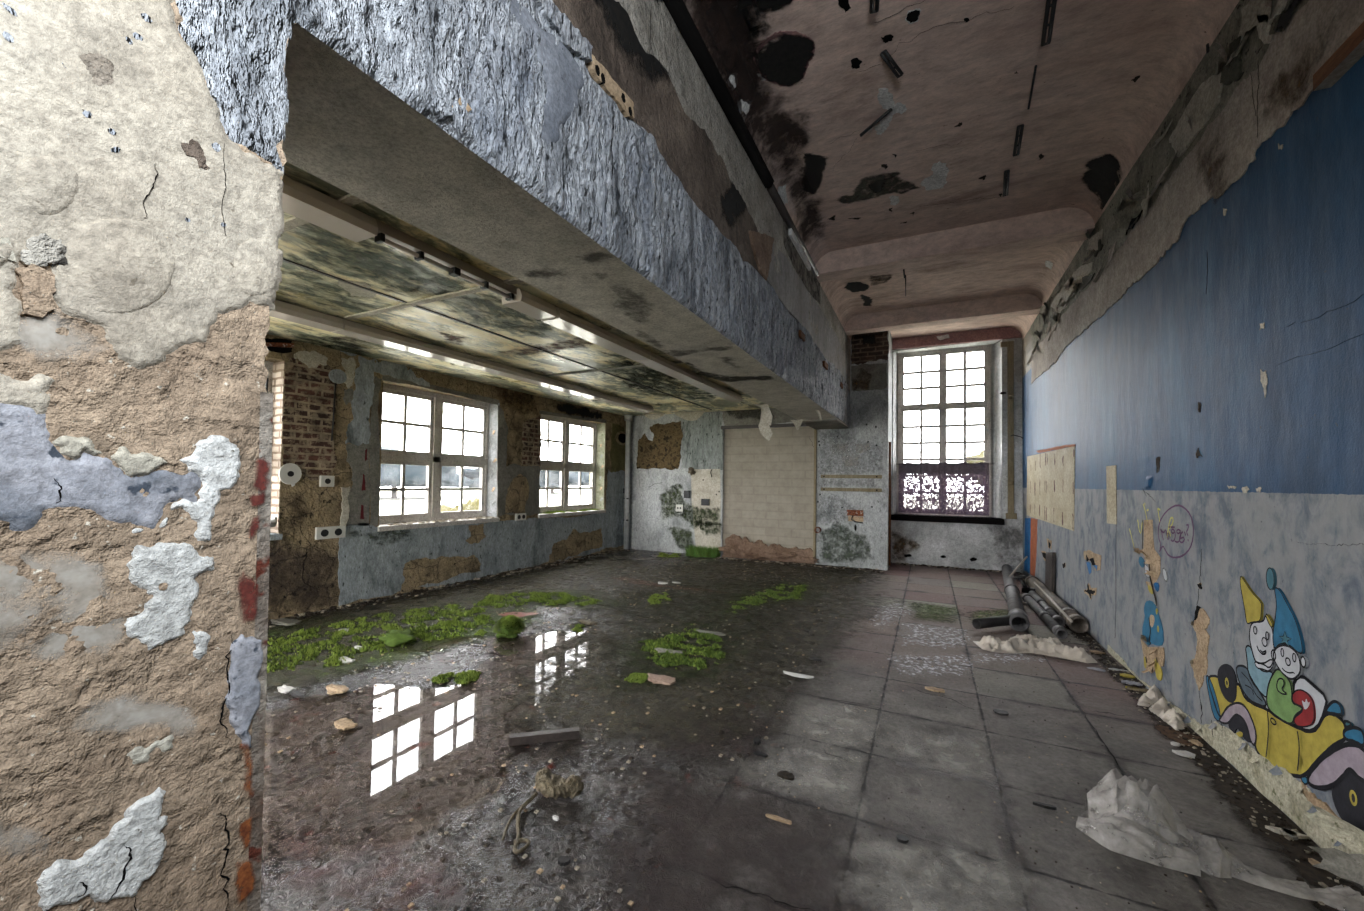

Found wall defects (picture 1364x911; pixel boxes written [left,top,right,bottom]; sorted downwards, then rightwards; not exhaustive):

damp [279,223,550,336]
peeling [0,0,889,428]
damp [602,290,773,400]
damp [683,0,828,244]
damp [1082,154,1121,210]
peeling [1027,0,1364,384]
peeling [0,373,241,660]
peeling [265,338,819,606]
damp [660,484,721,549]
damp [820,430,882,563]
peeling [36,787,168,911]
flaking render [1107,645,1364,903]